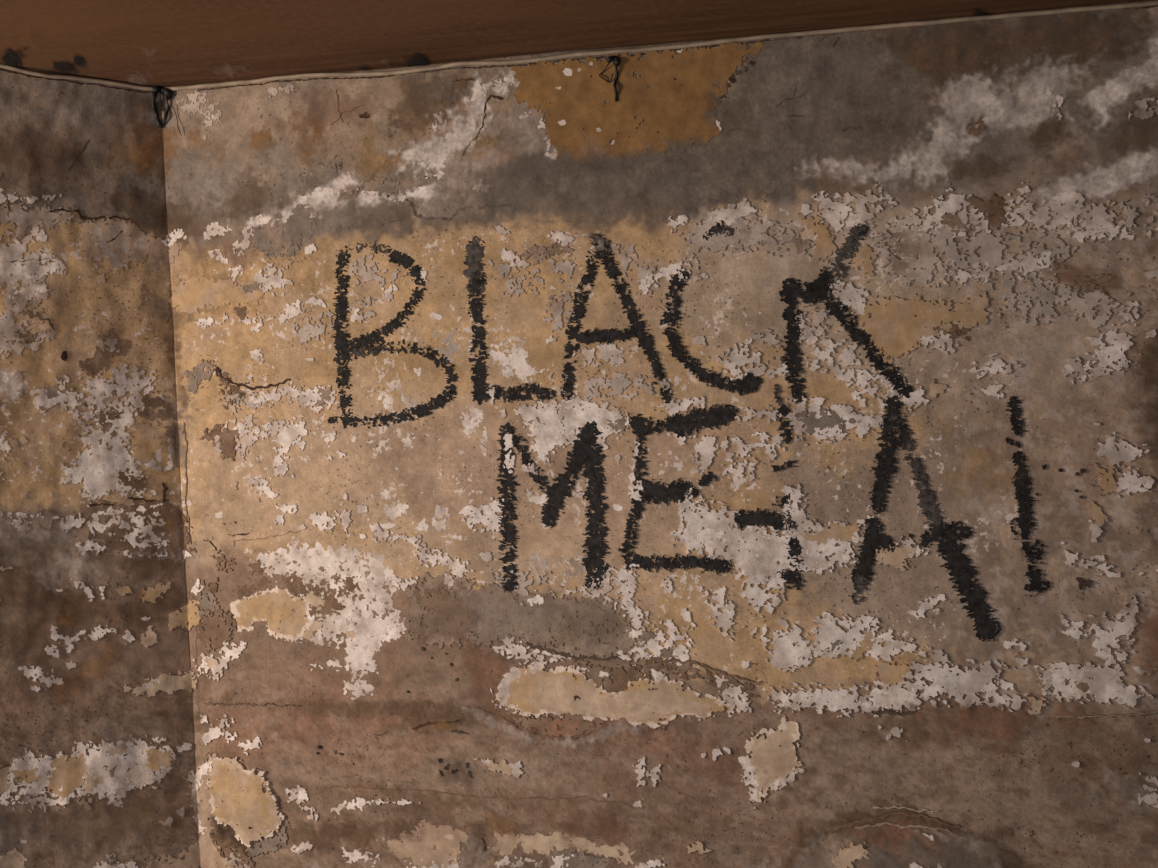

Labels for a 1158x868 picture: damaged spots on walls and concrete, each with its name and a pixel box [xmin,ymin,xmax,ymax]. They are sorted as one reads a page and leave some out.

peeling [172,86,223,140]
peeling [261,81,299,99]
crack [0,30,871,161]
damp [102,2,1158,246]
peeling [511,41,766,163]
spalling [968,116,986,137]
damp [0,188,62,204]
spalling [0,162,1158,809]
peeling [0,714,468,868]
damp [1123,772,1158,808]
peeling [687,840,712,854]
peeling [832,841,872,868]